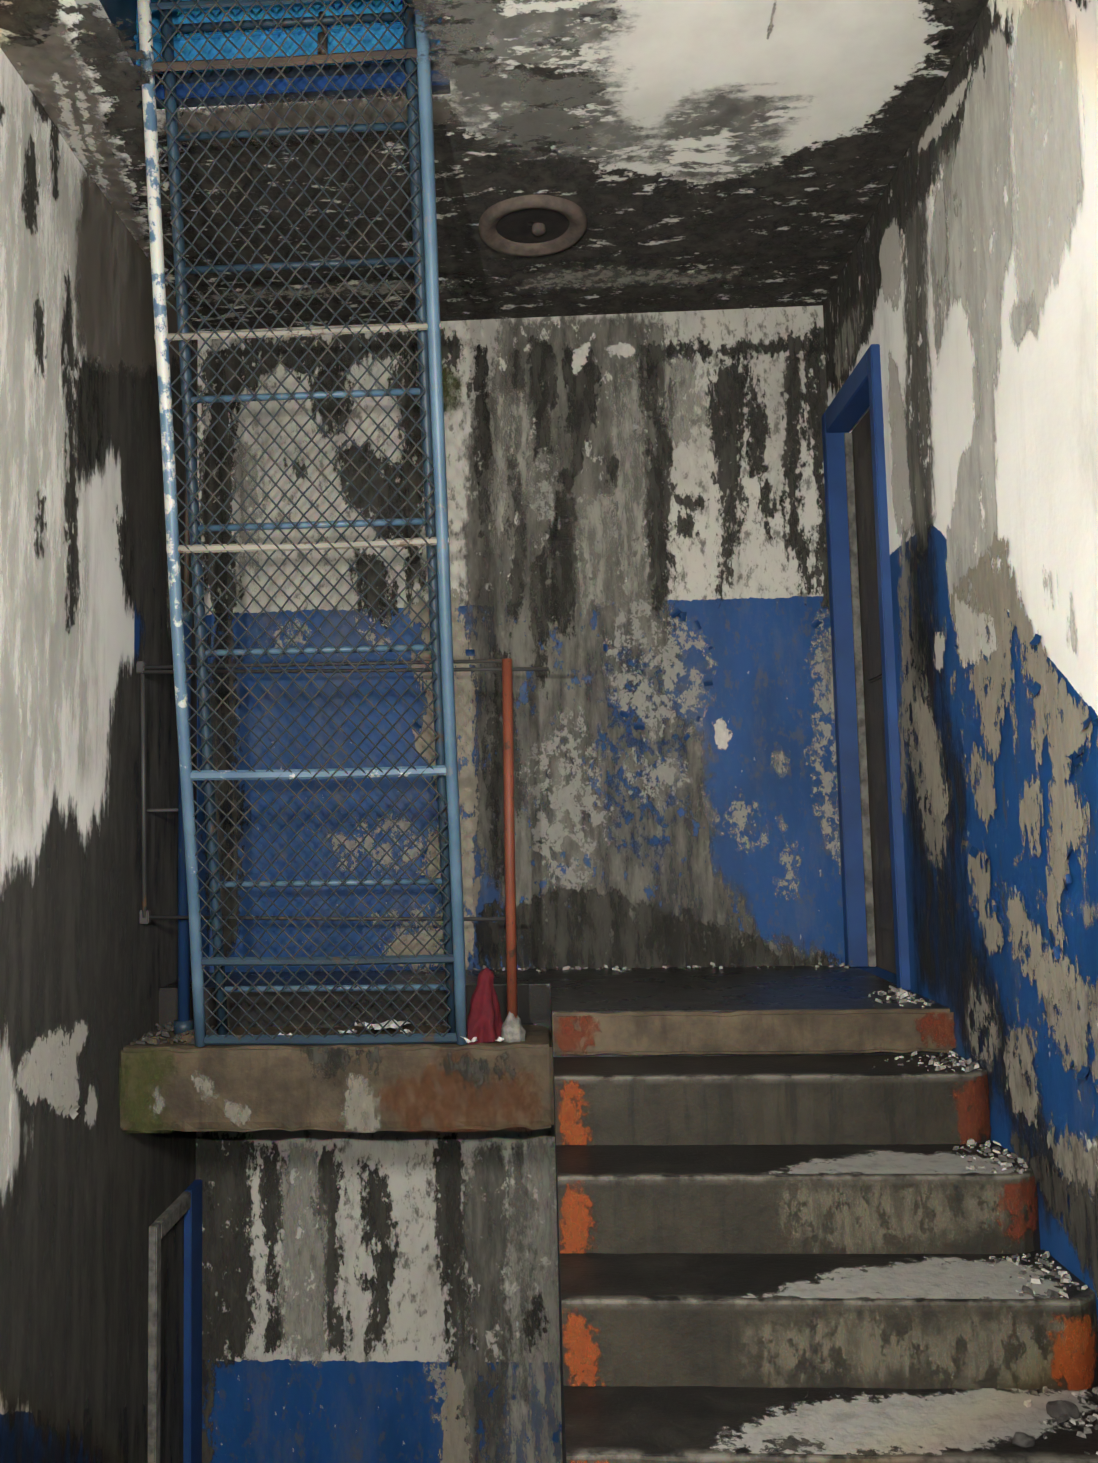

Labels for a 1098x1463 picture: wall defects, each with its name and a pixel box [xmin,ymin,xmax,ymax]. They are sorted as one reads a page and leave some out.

water stain [405,0,1087,969]
water stain [0,0,427,1463]
peeling [602,594,733,813]
peeling [697,789,801,897]
peeling [771,752,788,774]
peeling [802,609,841,874]
peeling [897,528,1098,1298]
peeling [424,1355,473,1463]
water stain [428,1132,563,1463]
flaking render [1048,1315,1096,1391]